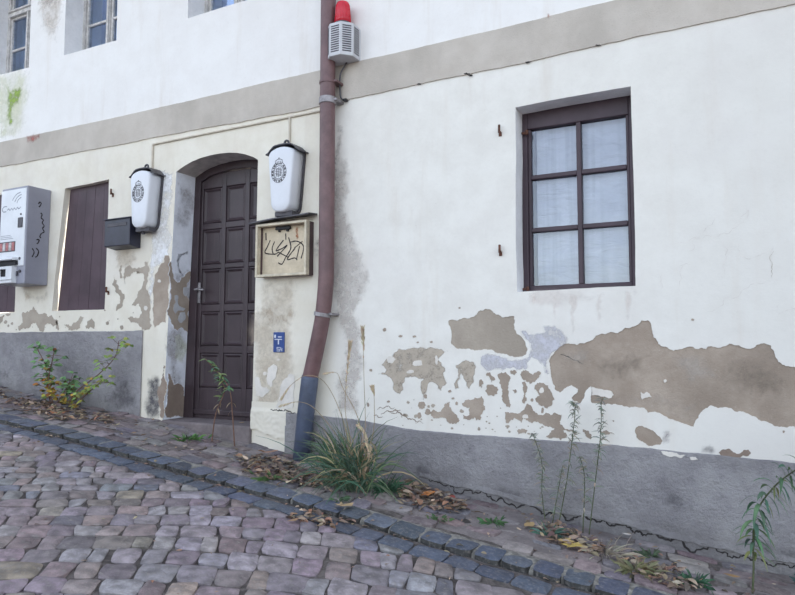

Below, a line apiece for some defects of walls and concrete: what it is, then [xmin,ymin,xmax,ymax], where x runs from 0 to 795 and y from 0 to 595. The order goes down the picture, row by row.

leakage [8,90,20,123]
peeling [0,306,95,332]
peeling [106,253,191,333]
flaking render [157,365,184,418]
peeling [382,335,615,440]